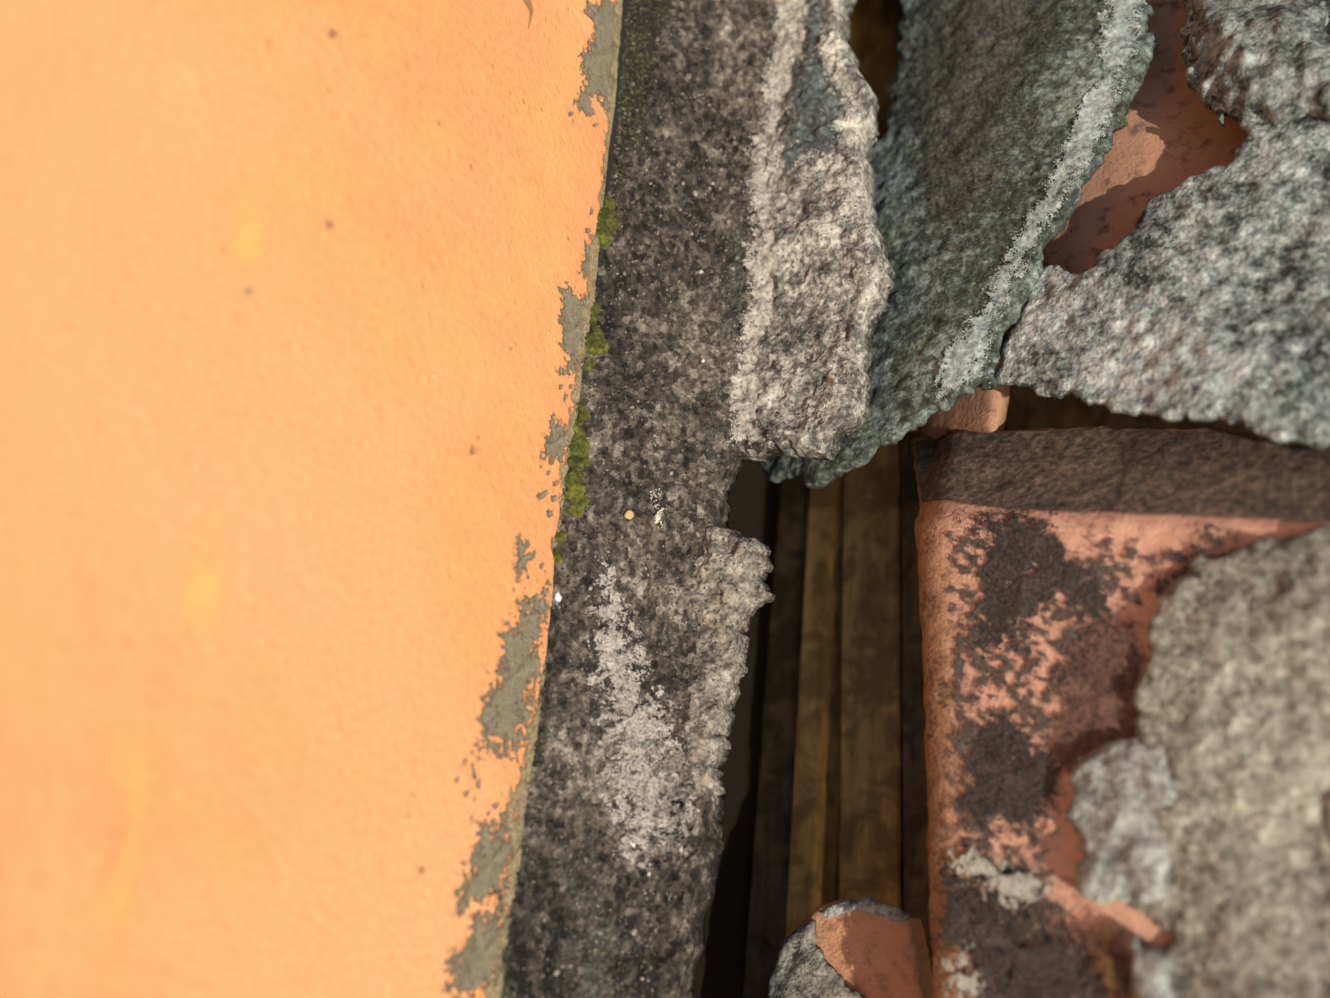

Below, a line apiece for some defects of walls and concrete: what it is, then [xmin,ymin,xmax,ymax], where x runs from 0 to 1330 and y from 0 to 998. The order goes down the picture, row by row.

peeling [441,0,623,998]
spalling [684,526,775,795]
water stain [915,428,1330,998]